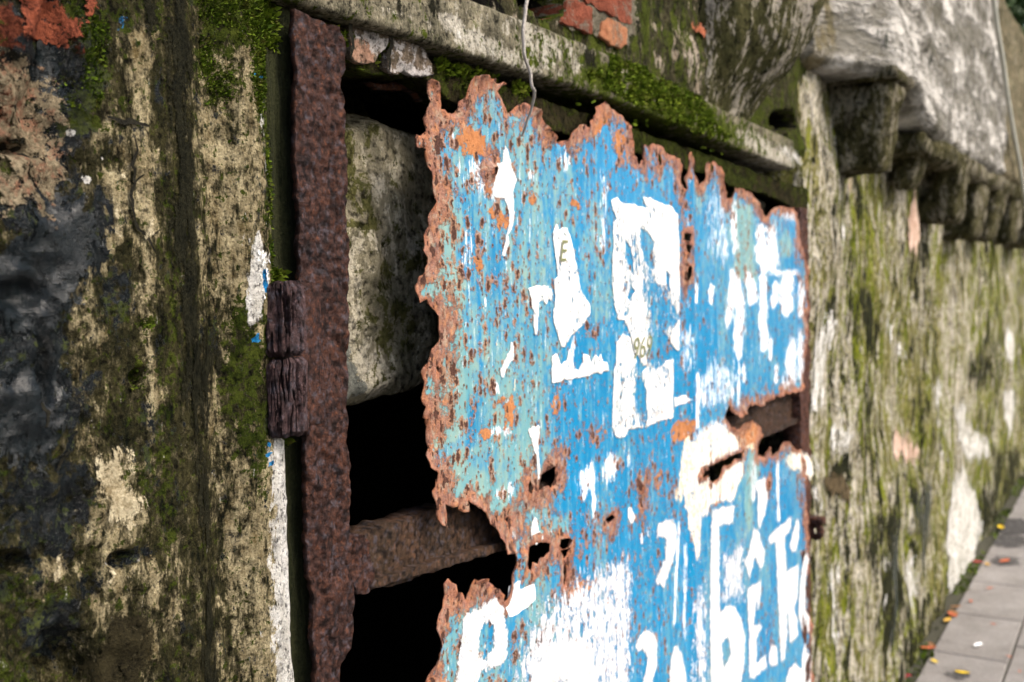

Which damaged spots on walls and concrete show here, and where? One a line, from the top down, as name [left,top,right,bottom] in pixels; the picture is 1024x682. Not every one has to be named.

water stain [29,18,76,163]
water stain [583,42,598,70]
water stain [0,175,108,477]
water stain [131,0,236,682]
peeling [681,421,744,561]
water stain [911,474,932,583]
water stain [990,517,1024,568]
water stain [946,667,971,681]